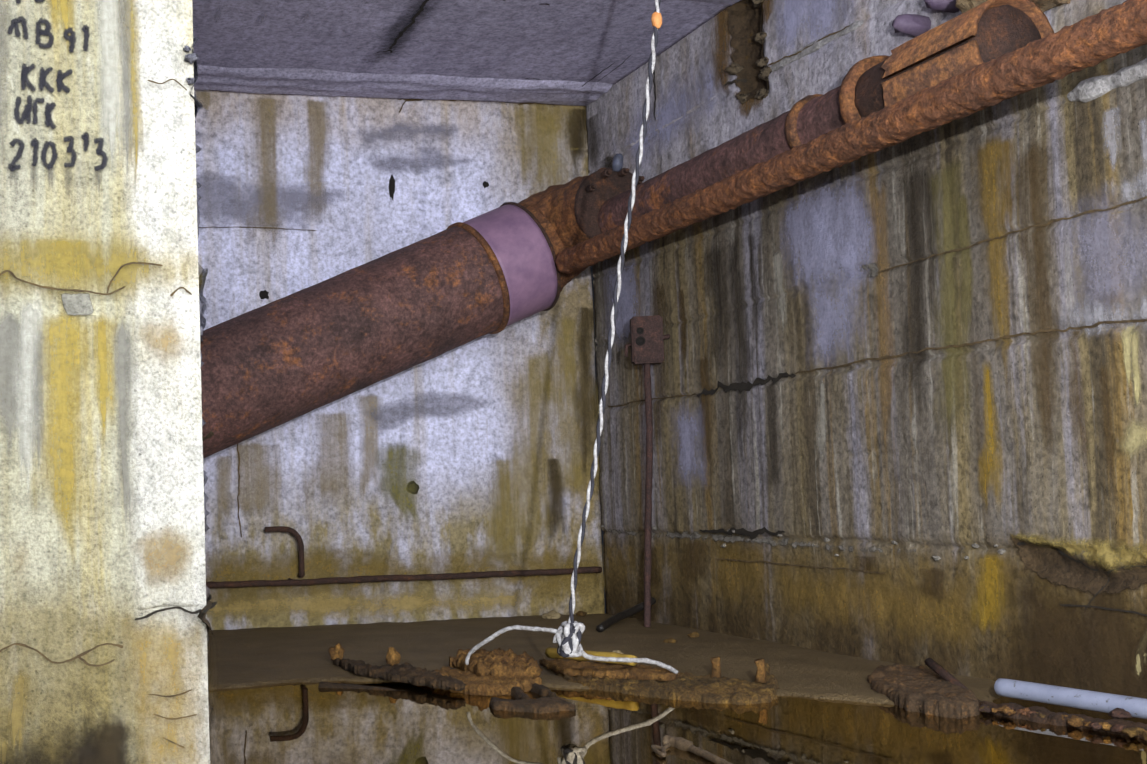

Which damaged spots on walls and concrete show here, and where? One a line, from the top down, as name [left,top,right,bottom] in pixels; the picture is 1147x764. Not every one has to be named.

damp [100,0,132,160]
spalling [725,0,772,104]
crack [0,262,192,296]
damp [0,307,40,467]
crack [608,319,1147,407]
damp [1070,301,1147,441]
rust [980,368,997,497]
crack [135,595,217,620]
spalling [601,525,900,556]
rust [978,556,1003,627]
spalling [994,534,1147,595]
damp [1018,534,1147,568]